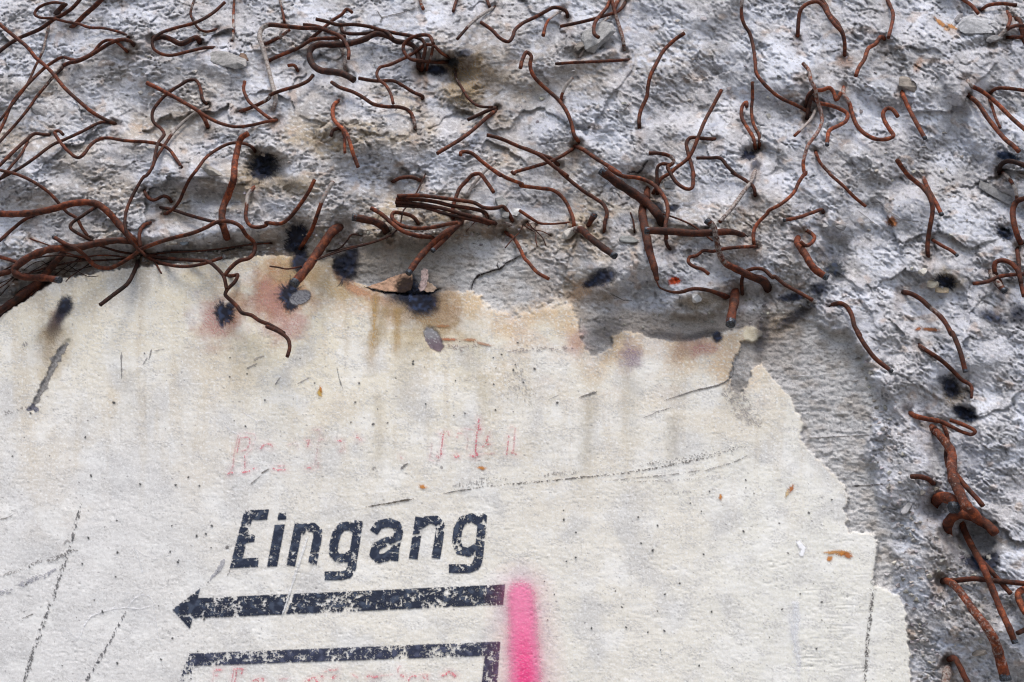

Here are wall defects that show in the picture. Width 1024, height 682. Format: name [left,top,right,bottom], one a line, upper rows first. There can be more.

spalling [0,0,820,328]
leakage [258,262,303,316]
spalling [423,327,464,351]
corrosion [437,324,491,346]
spalling [579,0,1024,682]
spalling [22,343,69,412]